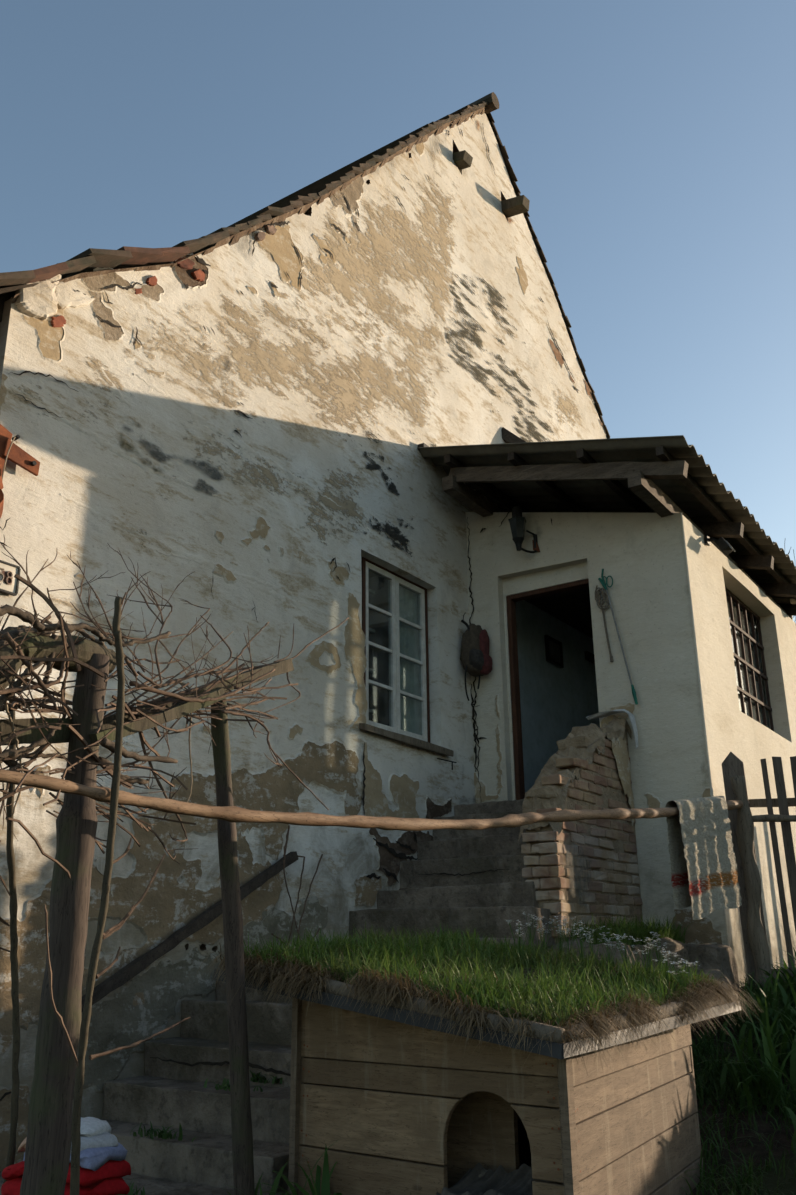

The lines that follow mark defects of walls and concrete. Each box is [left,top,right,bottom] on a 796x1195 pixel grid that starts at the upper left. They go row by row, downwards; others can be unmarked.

peeling [515,256,528,295]
flaking render [22,309,66,364]
peeling [69,357,131,420]
peeling [81,172,457,545]
peeling [548,338,595,435]
water stain [141,440,170,461]
water stain [187,460,223,495]
water stain [359,451,414,555]
flaking render [231,559,452,955]
flaking render [0,878,52,1056]
flaking render [73,770,225,1100]
crack [150,1057,291,1076]